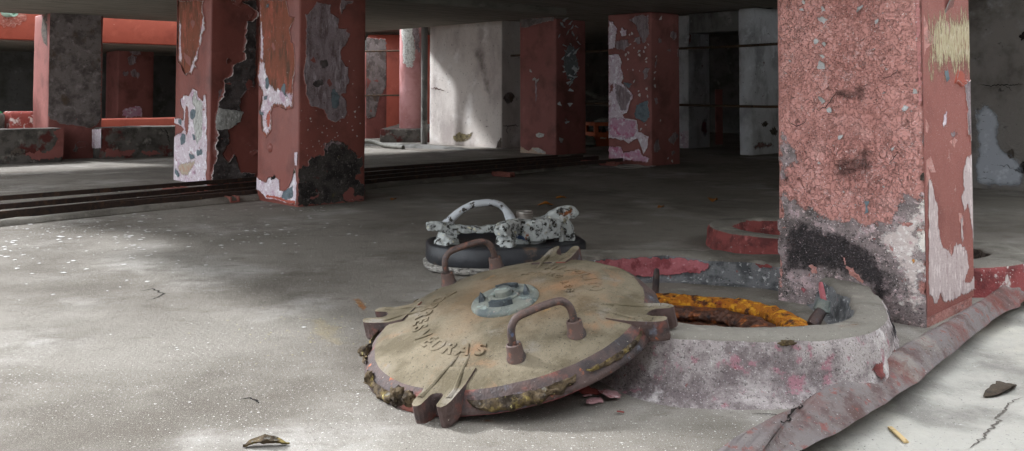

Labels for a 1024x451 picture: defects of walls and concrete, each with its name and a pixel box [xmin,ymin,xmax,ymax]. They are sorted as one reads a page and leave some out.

peeling [174,0,387,206]
peeling [608,14,662,163]
peeling [755,0,974,328]
leakage [783,200,926,338]
crack [970,397,1022,448]